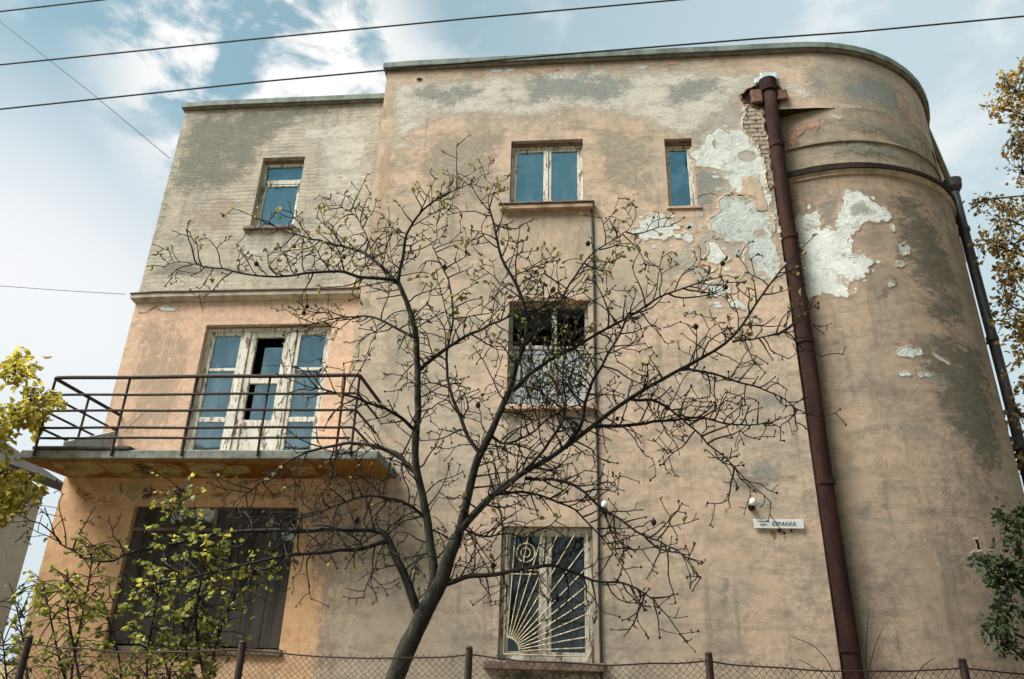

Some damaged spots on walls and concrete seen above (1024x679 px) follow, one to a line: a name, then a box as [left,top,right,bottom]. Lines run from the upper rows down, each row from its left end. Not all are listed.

damp [174,69,757,266]
flaking render [629,86,786,315]
damp [671,167,768,300]
flaking render [794,186,912,302]
damp [890,192,965,324]
flaking render [895,344,951,379]
damp [922,337,1002,472]